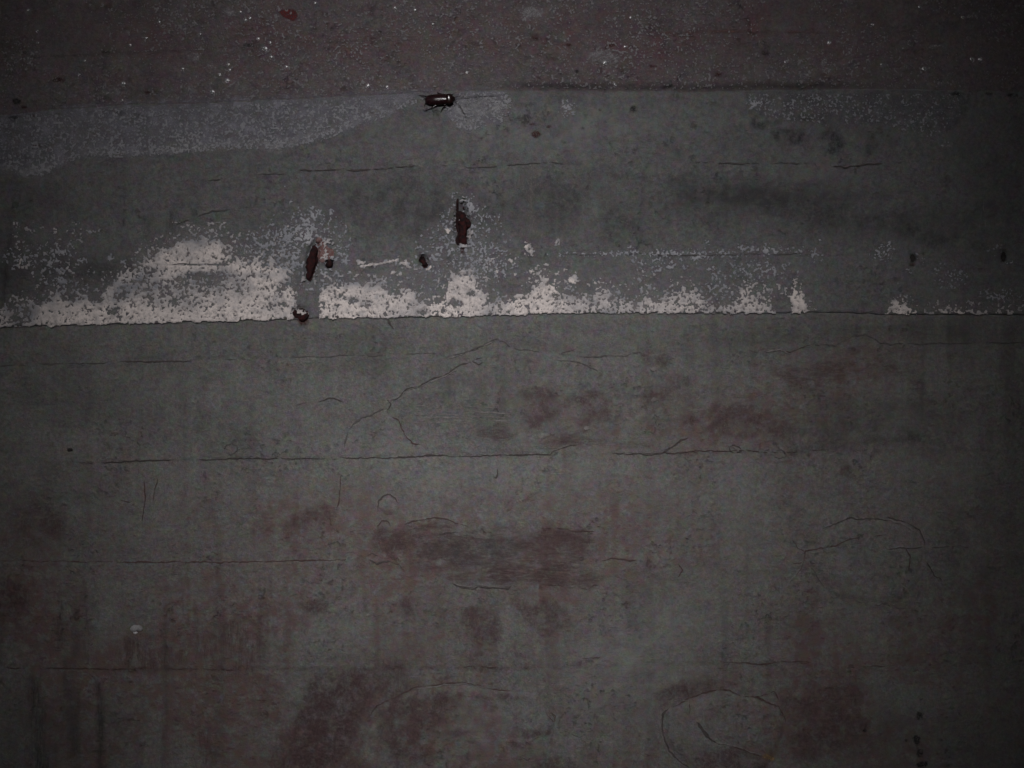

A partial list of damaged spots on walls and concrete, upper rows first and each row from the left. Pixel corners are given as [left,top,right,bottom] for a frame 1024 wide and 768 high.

damp [2,245,88,294]
damp [236,201,352,291]
damp [414,192,518,291]
damp [547,239,823,300]
crack [199,339,795,507]
crack [93,459,174,519]
crack [793,517,968,609]
crack [659,689,786,768]